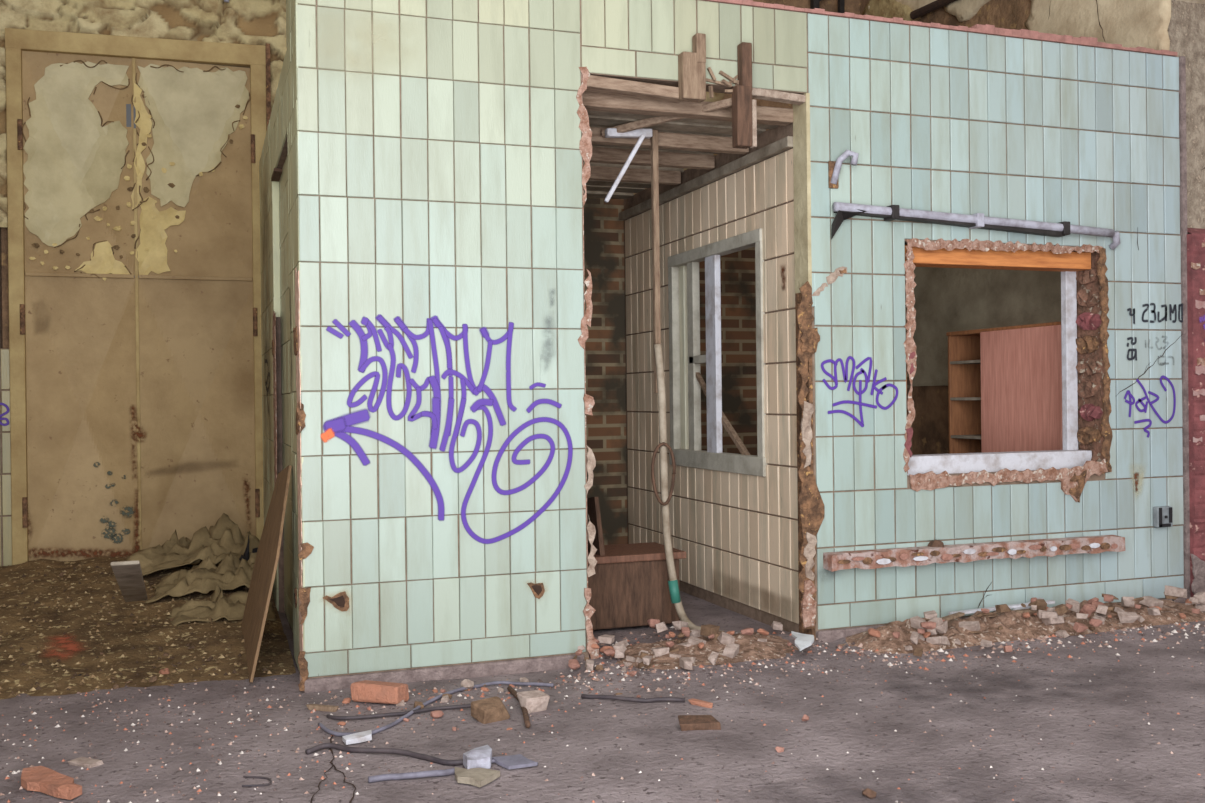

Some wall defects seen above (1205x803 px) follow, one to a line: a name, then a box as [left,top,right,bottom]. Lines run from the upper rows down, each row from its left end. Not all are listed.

peeling [753,0,921,21]
peeling [1024,0,1171,50]
peeling [23,60,251,281]
flaking render [0,0,287,227]
spalling [576,67,592,206]
rust [131,406,145,476]
spalling [293,268,314,691]
spalling [583,515,604,670]
spalling [797,266,847,629]
peeling [838,543,1118,565]
spalling [903,237,1113,502]
crack [310,735,356,803]